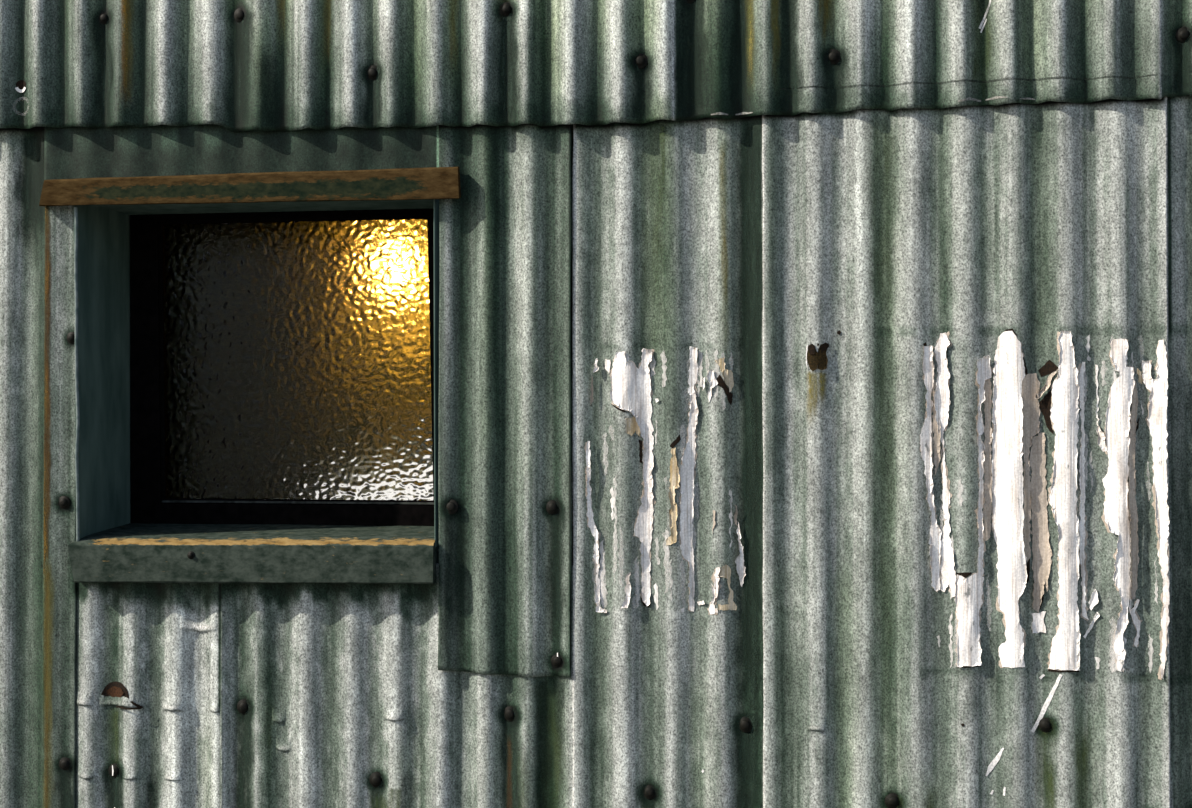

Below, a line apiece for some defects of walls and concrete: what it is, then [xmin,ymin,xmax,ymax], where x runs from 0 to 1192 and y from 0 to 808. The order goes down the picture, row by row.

corrosion [122,0,132,83]
corrosion [807,344,828,411]
corrosion [43,206,51,807]
corrosion [107,686,124,697]